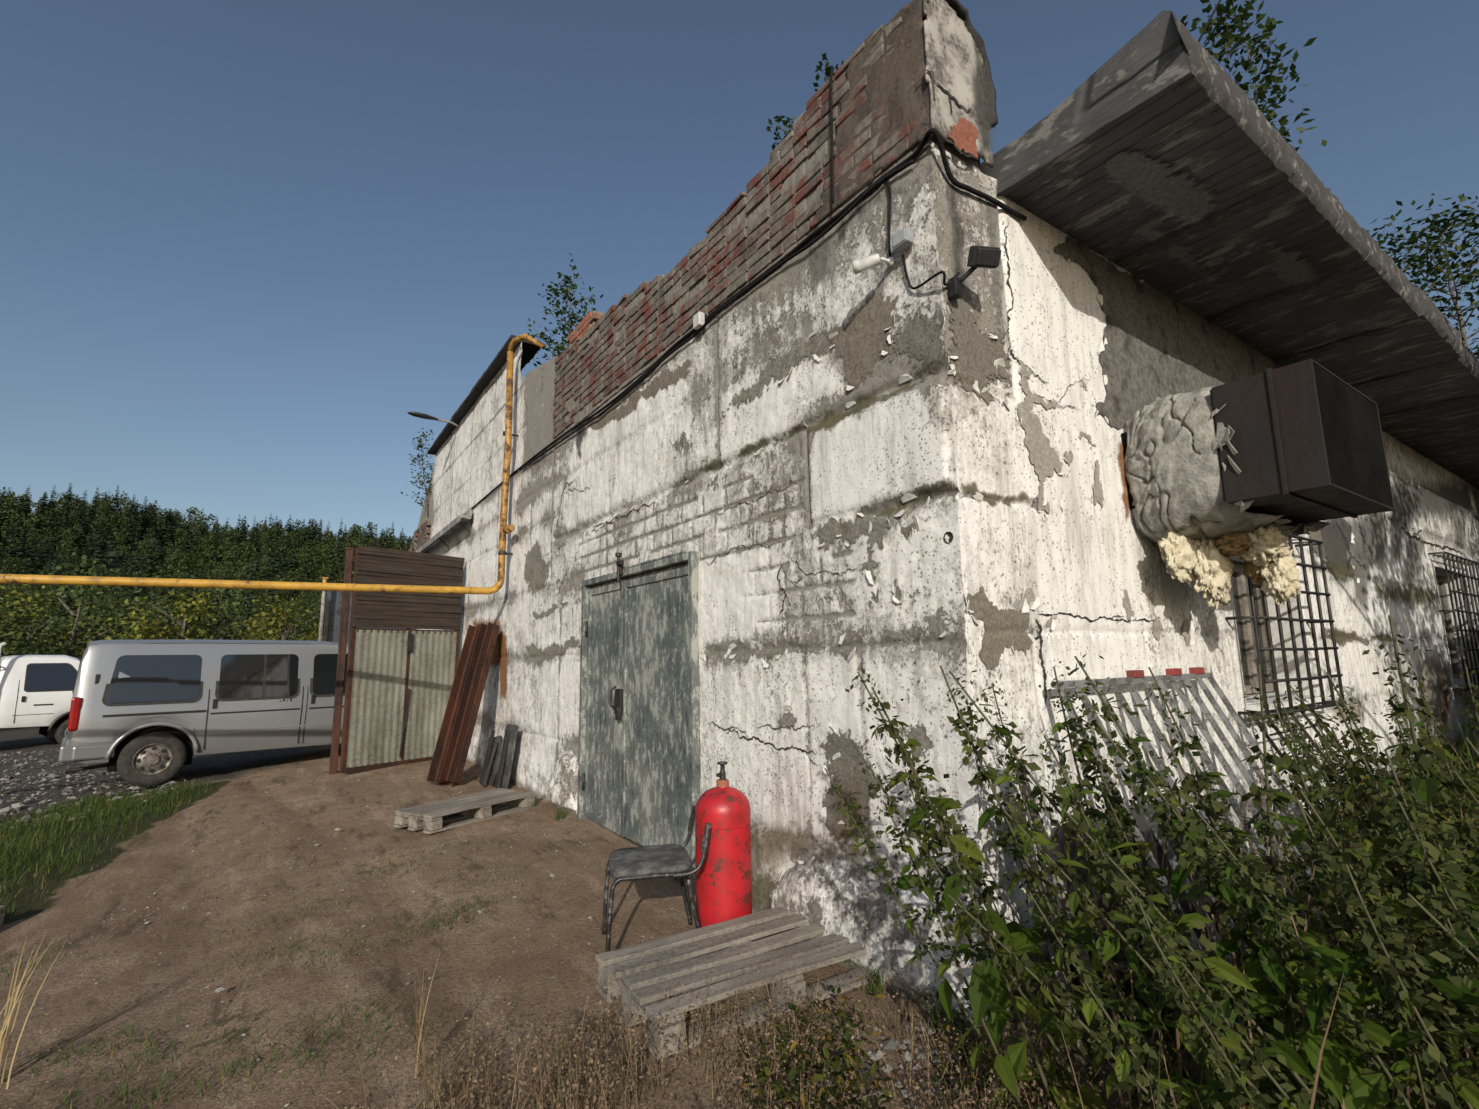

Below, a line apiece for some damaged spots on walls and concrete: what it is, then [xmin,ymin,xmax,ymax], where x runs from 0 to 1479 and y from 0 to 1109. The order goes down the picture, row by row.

crack [1004,221,1091,408]
peeling [1046,236,1283,429]
spalling [721,290,1106,514]
peeling [524,540,581,620]
spalling [964,586,1058,669]
crack [1021,610,1154,709]
crack [707,722,817,765]
flaking render [819,726,883,842]